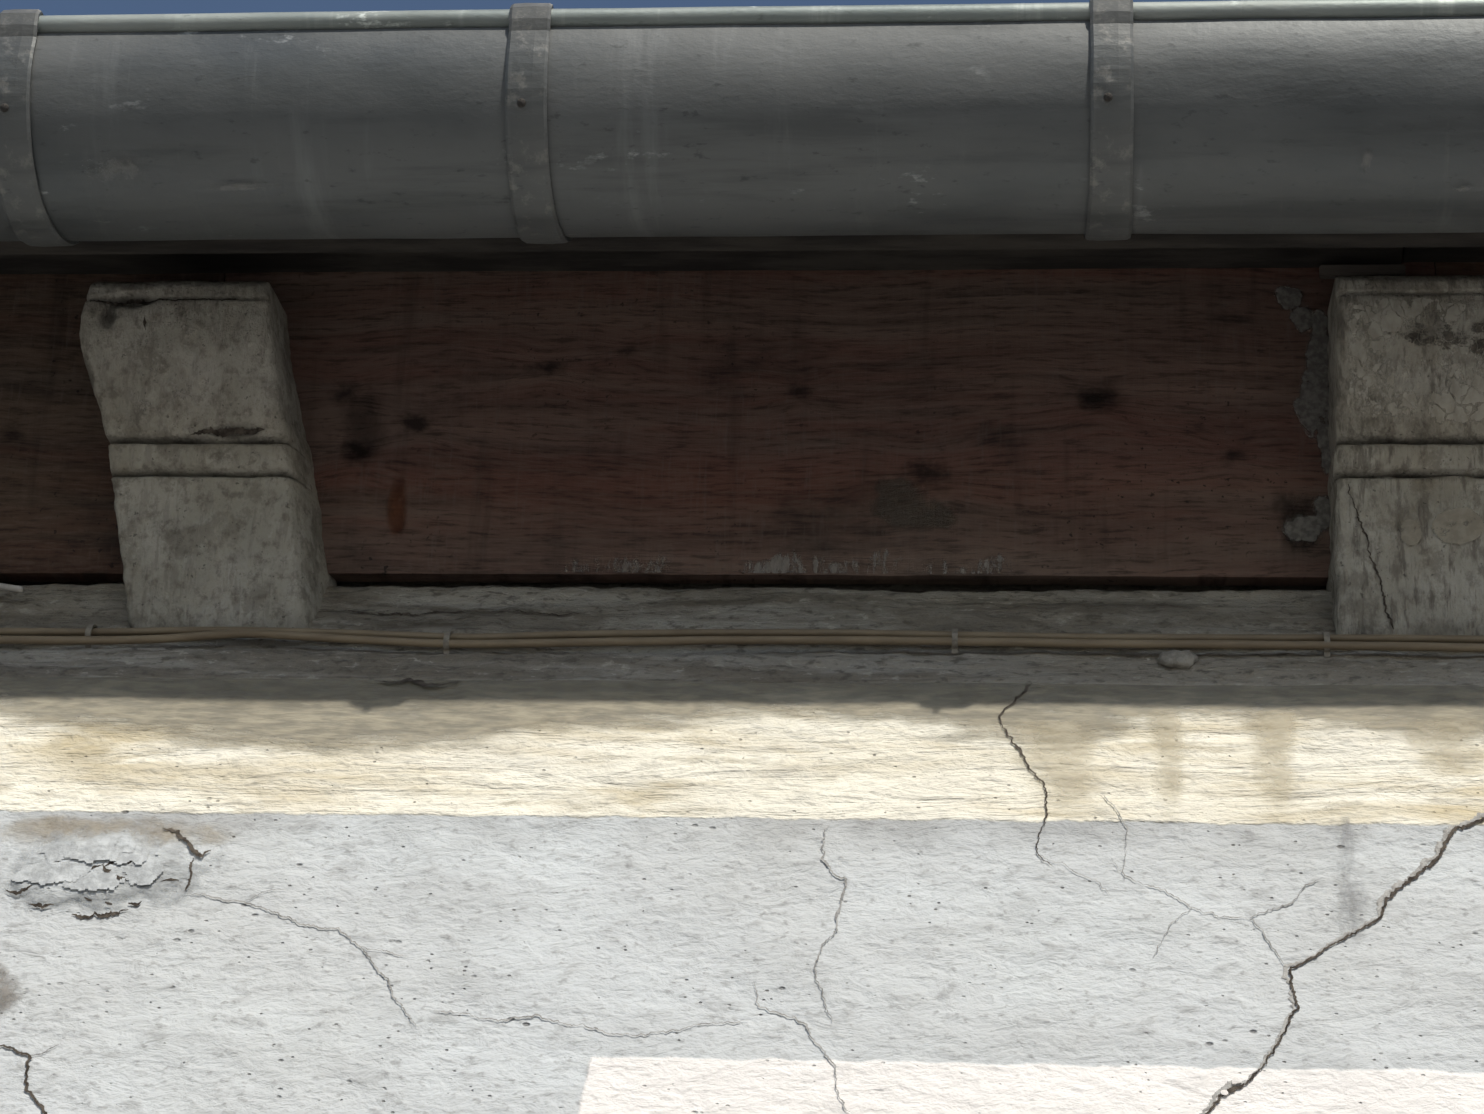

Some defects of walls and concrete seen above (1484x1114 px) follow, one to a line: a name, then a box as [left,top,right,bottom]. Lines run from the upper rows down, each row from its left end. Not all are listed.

crack [1348,484,1394,629]
leakage [0,677,1484,786]
crack [175,824,850,1112]
crack [998,683,1484,1114]
crack [0,1044,59,1114]